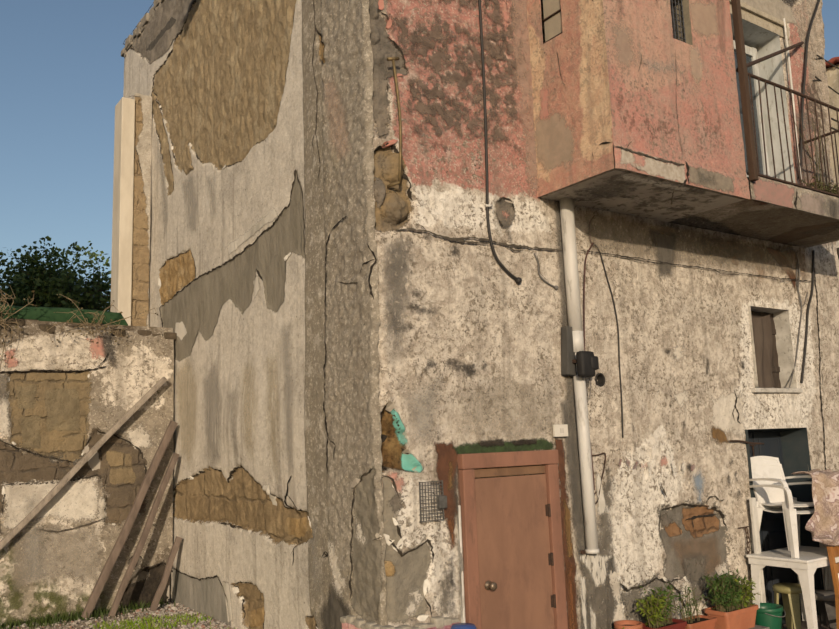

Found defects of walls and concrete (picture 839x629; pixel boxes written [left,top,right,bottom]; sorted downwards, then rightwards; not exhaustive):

spalling [124,0,296,196]
crack [312,0,323,177]
mould [387,0,526,151]
peeling [129,96,305,361]
damp [556,201,568,327]
crack [396,224,826,470]
damp [570,174,791,275]
spalling [0,349,152,534]
spalling [173,465,314,545]
spalling [328,399,435,623]
rust [434,442,458,549]
rust [554,439,578,629]